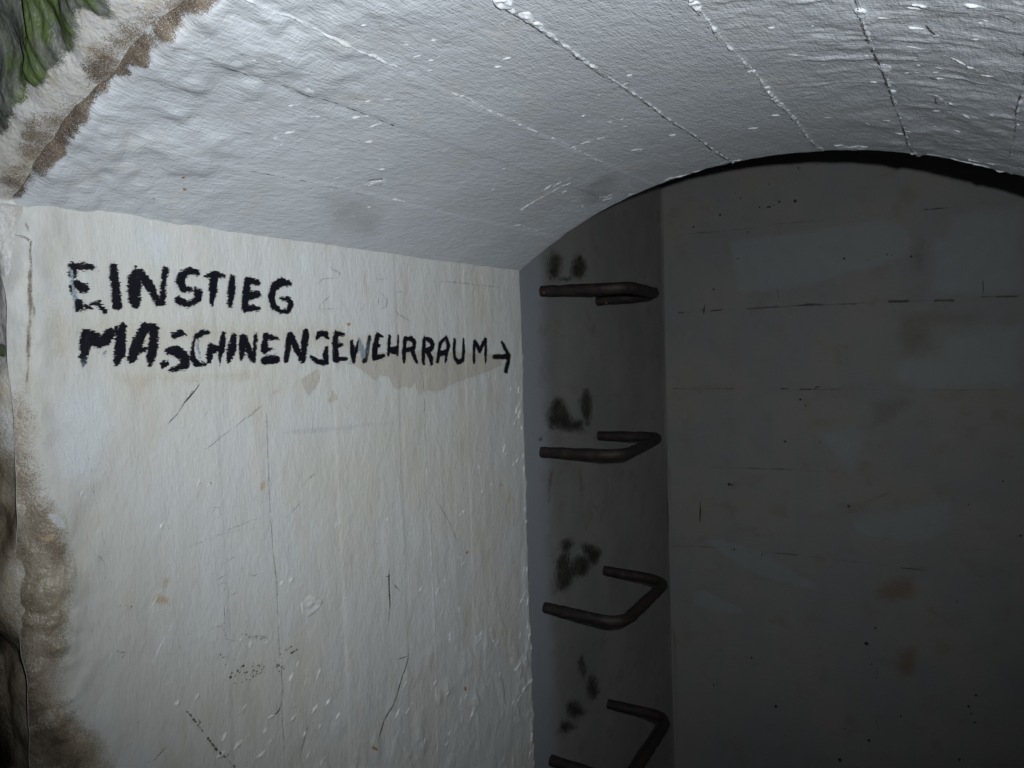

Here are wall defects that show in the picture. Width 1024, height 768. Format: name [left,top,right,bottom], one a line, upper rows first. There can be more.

water stain [0,0,226,199]